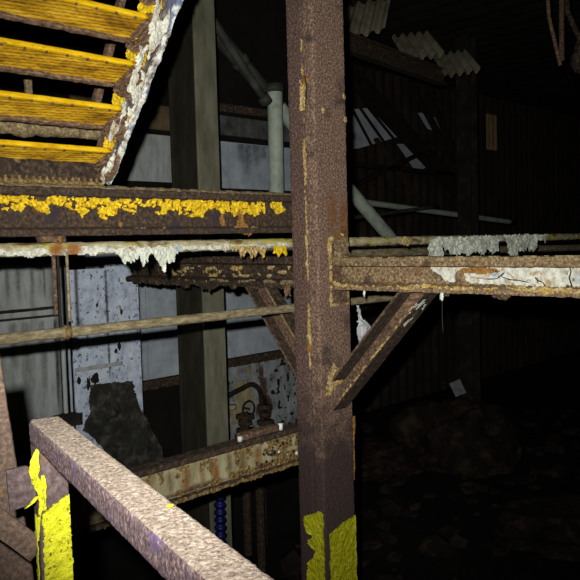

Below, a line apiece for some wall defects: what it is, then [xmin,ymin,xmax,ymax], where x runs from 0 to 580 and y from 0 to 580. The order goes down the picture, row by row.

peeling [100,0,170,185]
rust [299,64,309,111]
peeling [0,195,286,237]
rust [263,280,294,299]
rust [327,233,502,307]
rust [387,283,580,329]
peeling [431,267,580,287]
crack [488,272,546,286]
rust [325,363,343,396]
rust [166,433,299,505]